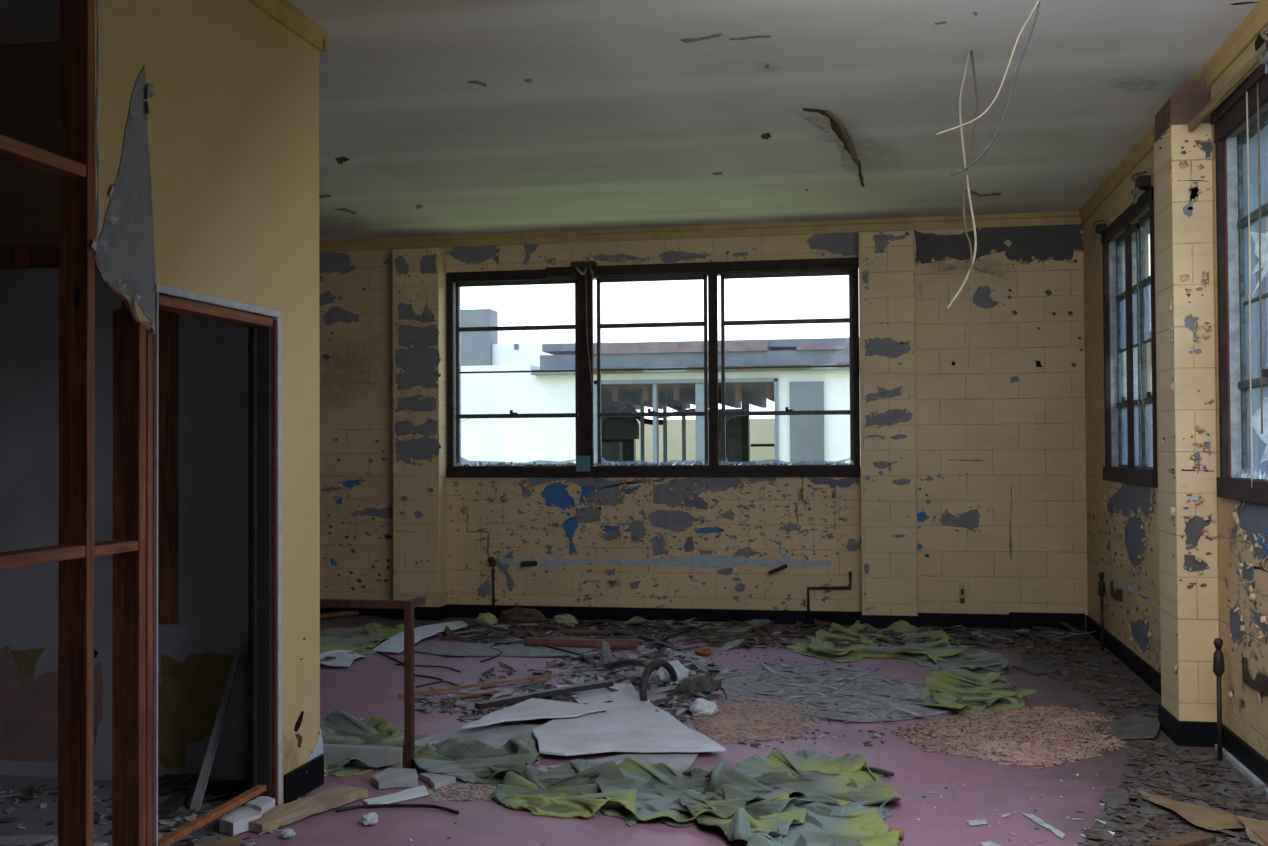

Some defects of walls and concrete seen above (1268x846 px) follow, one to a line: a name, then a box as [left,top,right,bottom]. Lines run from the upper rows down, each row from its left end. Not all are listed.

peeling [319,252,361,360]
peeling [367,245,500,465]
peeling [864,322,914,365]
peeling [806,220,1083,305]
peeling [863,385,913,442]
peeling [1160,424,1215,473]
peeling [320,479,423,590]
peeling [477,546,519,600]
peeling [1093,483,1155,584]
peeling [1107,593,1155,658]
peeling [1169,492,1219,589]
peeling [1227,500,1268,662]